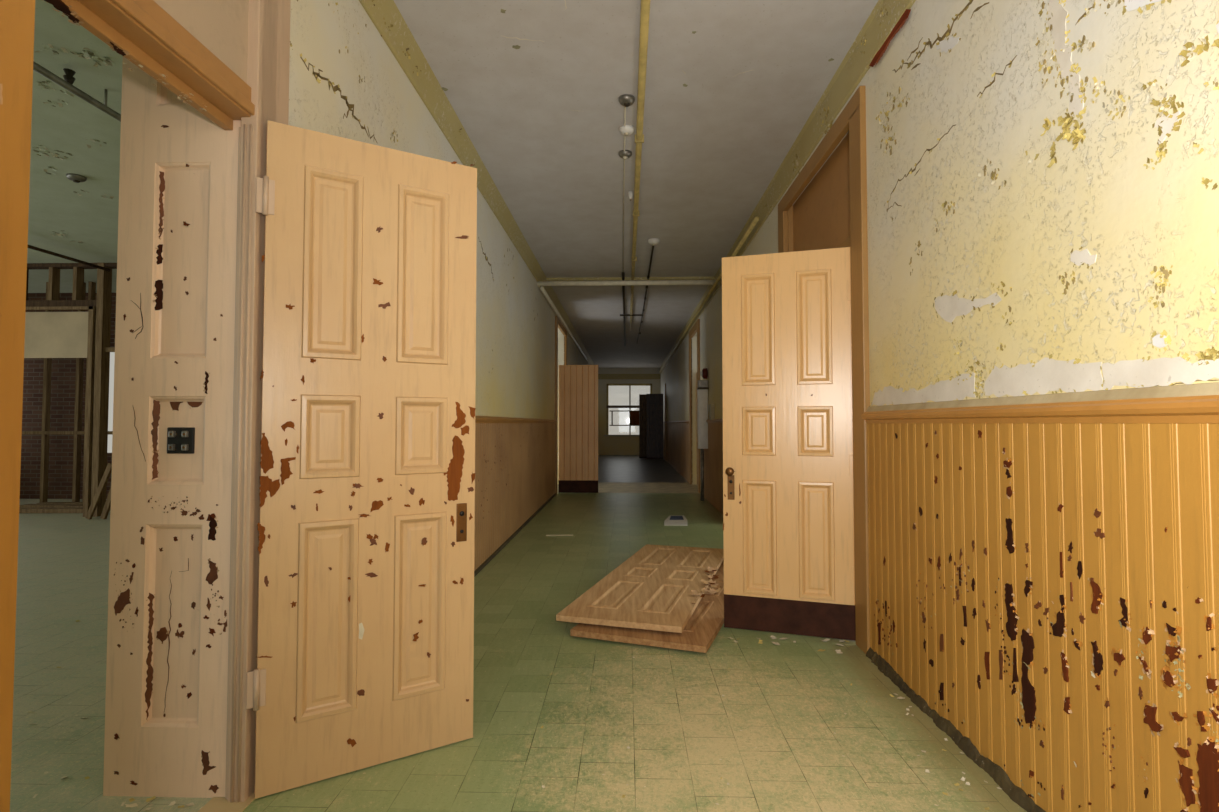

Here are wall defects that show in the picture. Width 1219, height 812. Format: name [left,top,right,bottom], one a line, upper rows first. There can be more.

peeling [860,7,911,67]
crack [892,0,989,73]
crack [300,53,378,144]
peeling [875,86,910,155]
flaking render [1025,0,1185,170]
crack [887,125,955,211]
peeling [978,159,1006,190]
flaking render [1059,246,1097,295]
peeling [1148,265,1173,308]
peeling [1002,448,1015,499]
peeling [1094,508,1105,539]
peeling [874,599,899,647]